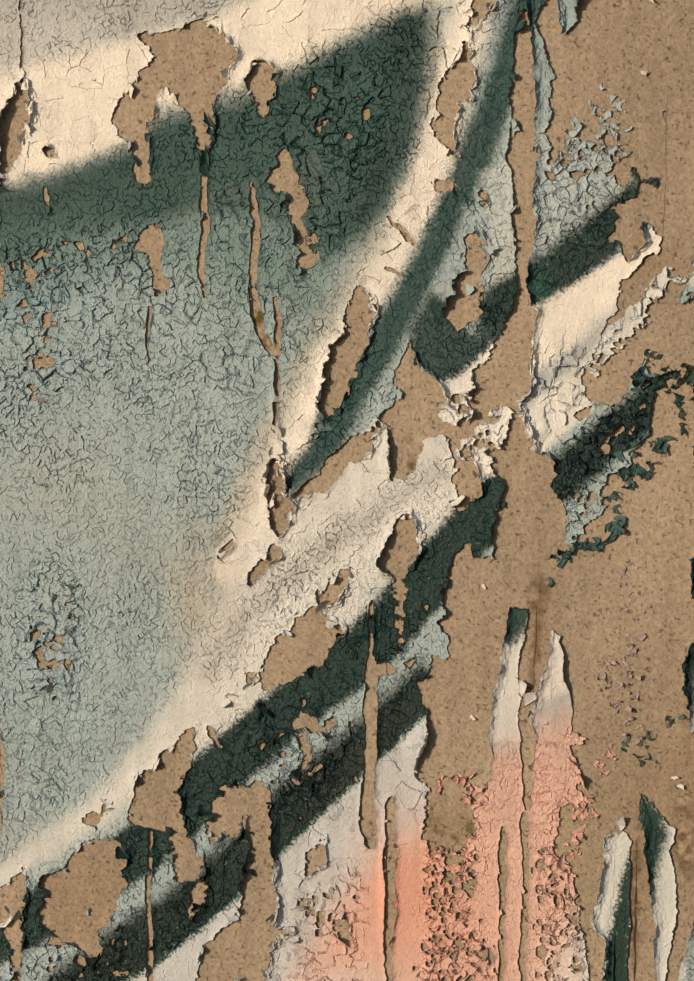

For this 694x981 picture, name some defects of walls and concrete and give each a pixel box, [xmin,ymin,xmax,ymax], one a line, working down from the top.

peeling [0,76,32,196]
crack [17,0,25,76]
peeling [111,11,237,187]
crack [196,174,210,298]
crack [248,181,285,426]
crack [386,215,415,246]
peeling [221,0,694,981]
peeling [36,798,129,963]
crack [144,829,154,981]
peeling [127,727,208,920]
peeling [195,778,303,981]
crack [355,600,398,981]